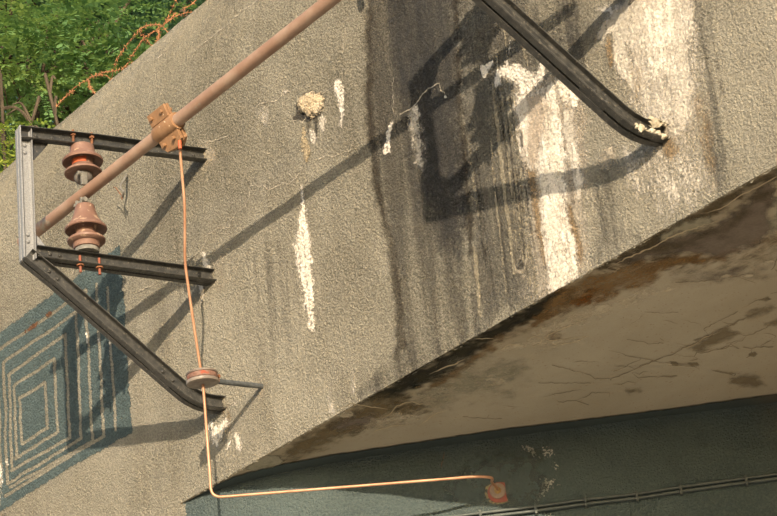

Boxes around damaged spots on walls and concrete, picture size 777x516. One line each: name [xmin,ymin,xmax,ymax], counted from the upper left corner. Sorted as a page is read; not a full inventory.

efflorescence [333,80,345,127]
crack [383,79,447,172]
water stain [367,0,479,290]
water stain [480,30,589,298]
water stain [597,0,777,270]
efflorescence [292,185,315,332]
water stain [283,363,527,462]
water stain [473,246,487,316]
crack [544,273,776,405]
water stain [693,307,771,351]
water stain [712,370,762,387]